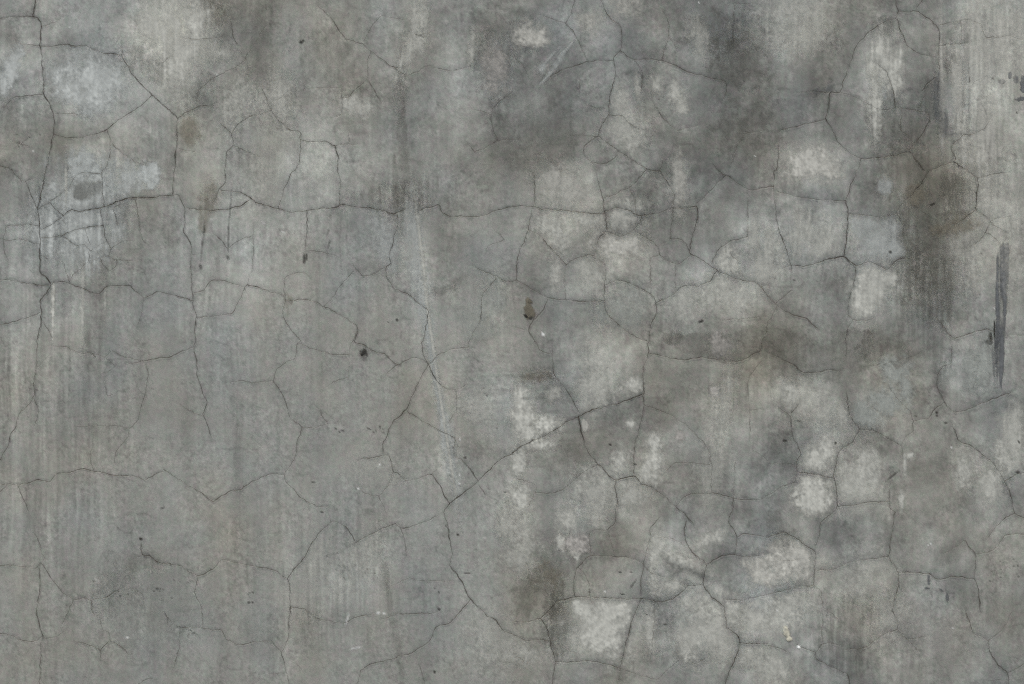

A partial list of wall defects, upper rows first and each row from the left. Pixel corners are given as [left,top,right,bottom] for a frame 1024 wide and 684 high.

leakage [514,22,549,47]
leakage [609,77,688,150]
leakage [673,161,685,198]
crack [2,0,402,507]
crack [333,292,455,481]
crack [360,1,1002,684]
leakage [780,358,912,426]
crack [897,368,1022,553]
crack [259,523,409,660]